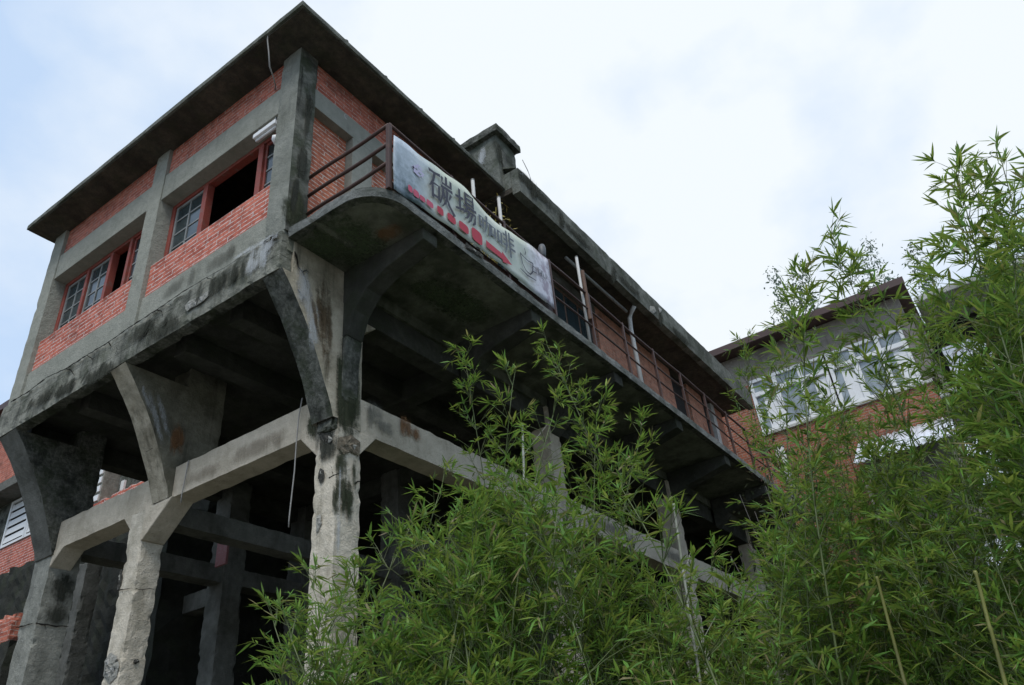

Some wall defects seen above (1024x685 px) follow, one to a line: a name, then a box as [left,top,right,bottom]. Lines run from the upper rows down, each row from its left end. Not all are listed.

water stain [311,288,360,427]
water stain [307,418,356,518]
spalling [318,425,360,456]
water stain [46,574,74,623]